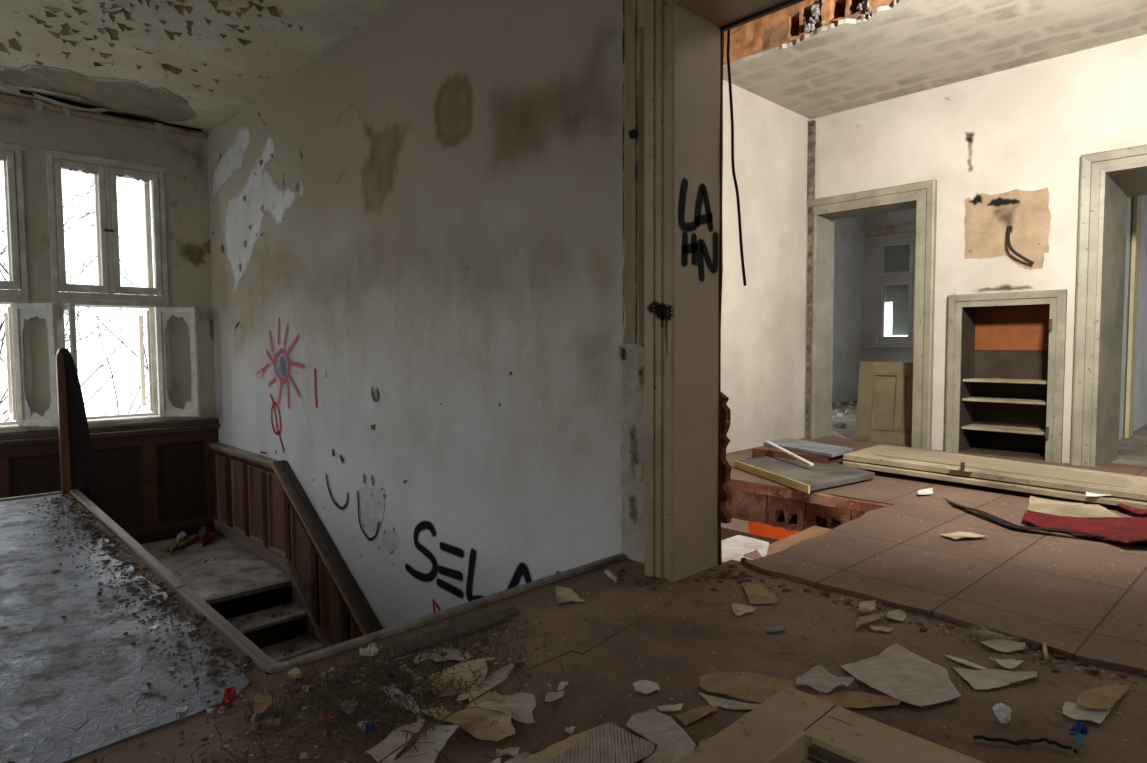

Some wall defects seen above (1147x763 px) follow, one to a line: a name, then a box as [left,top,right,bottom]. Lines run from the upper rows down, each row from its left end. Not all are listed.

flaking render [0,0,303,121]
peeling [204,127,304,292]
flaking render [618,343,645,563]